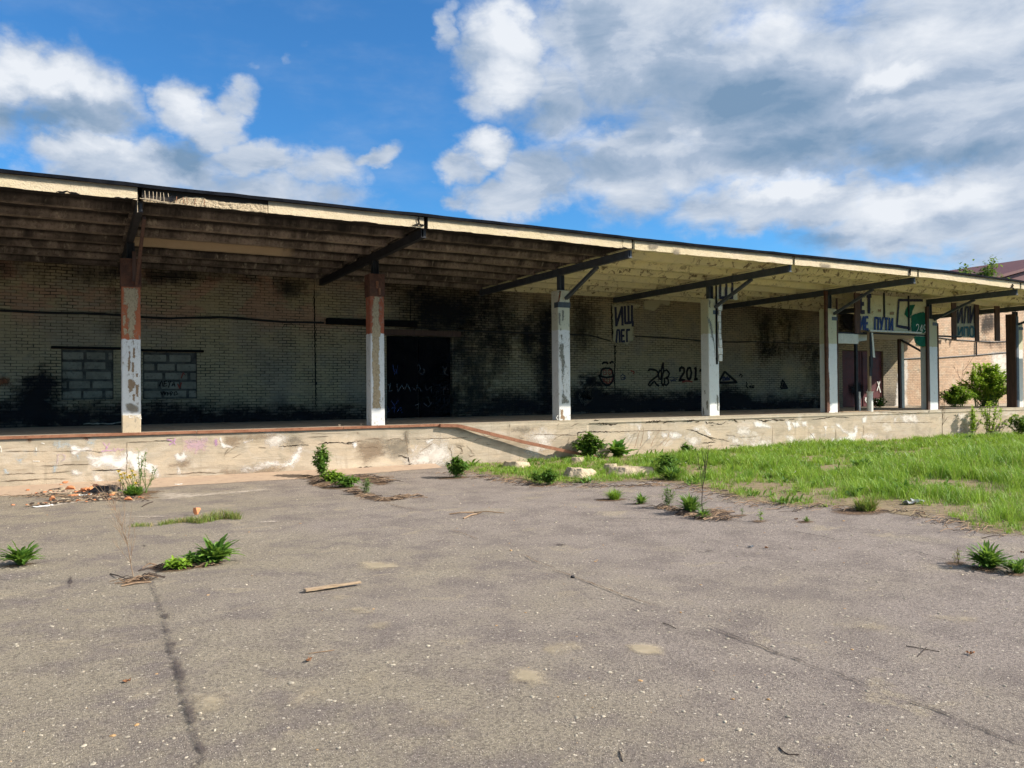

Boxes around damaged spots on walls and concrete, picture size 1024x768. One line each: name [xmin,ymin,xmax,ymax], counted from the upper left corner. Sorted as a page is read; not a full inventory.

spalling [140,191,268,213]
peeling [123,287,139,402]
leakage [0,363,367,474]
peeling [372,296,381,408]
leakage [436,387,549,417]
leakage [475,291,539,375]
peeling [558,310,569,420]